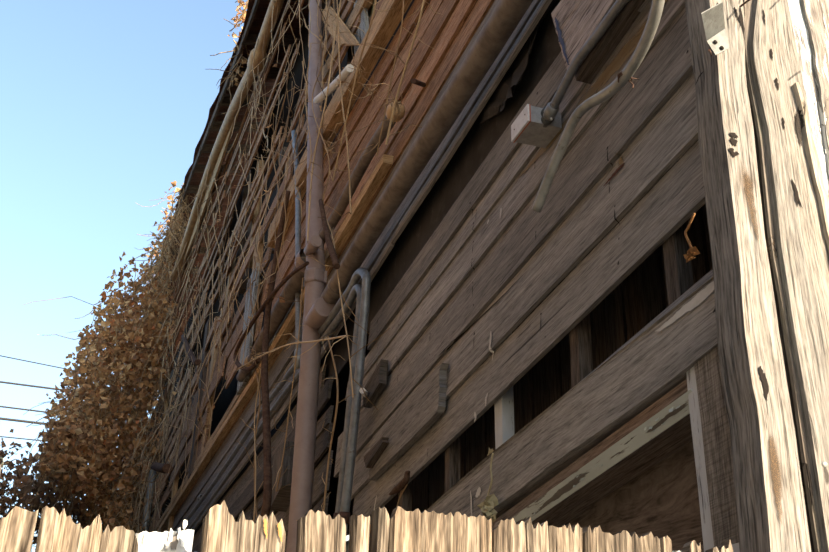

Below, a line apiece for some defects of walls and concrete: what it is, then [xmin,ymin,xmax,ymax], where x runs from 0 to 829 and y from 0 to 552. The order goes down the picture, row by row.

peeling [815,98,829,136]
peeling [644,402,687,433]
peeling [533,473,587,515]